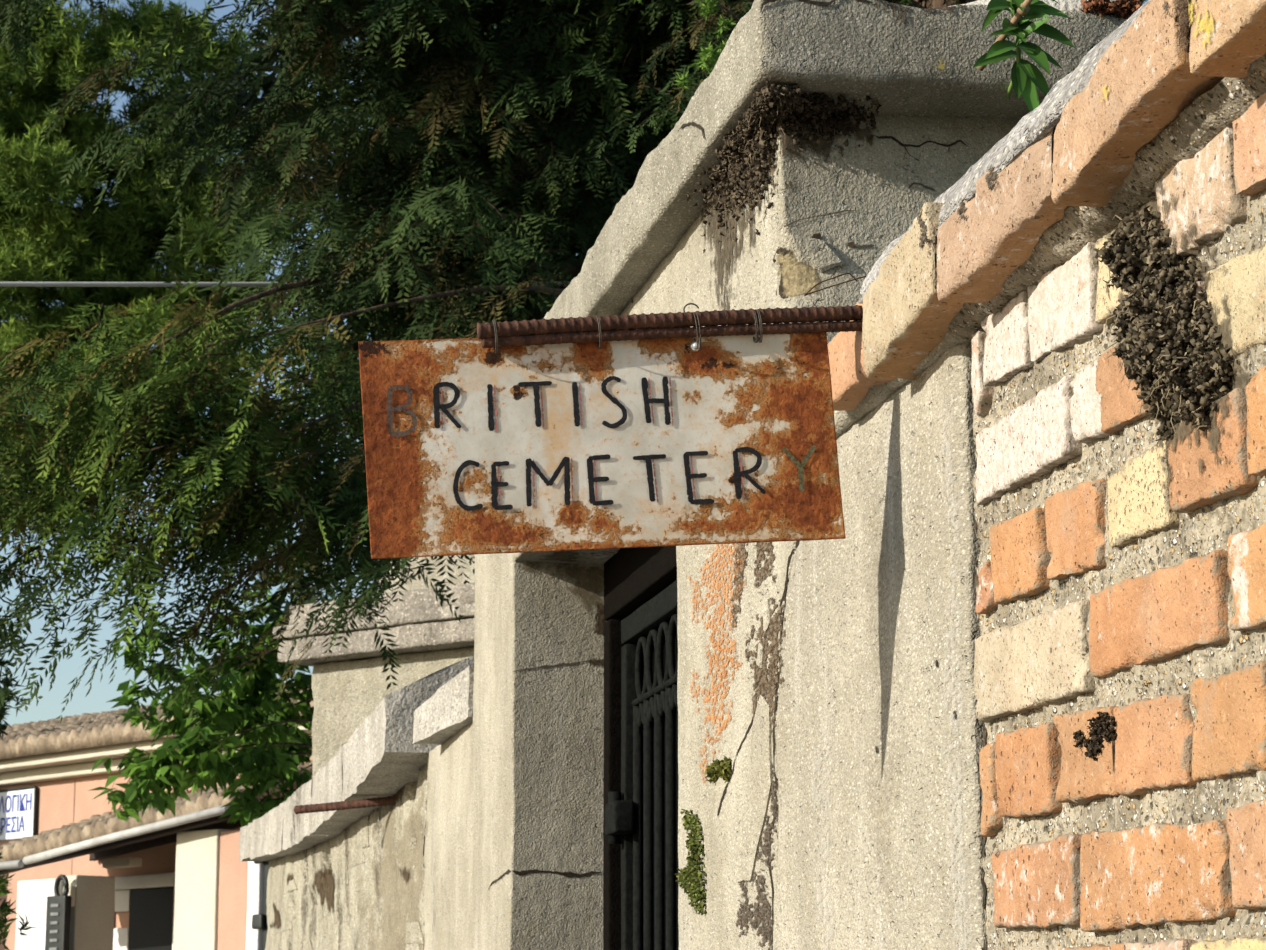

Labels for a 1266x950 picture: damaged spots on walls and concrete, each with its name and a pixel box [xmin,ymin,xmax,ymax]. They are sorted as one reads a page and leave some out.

leakage [780,113,878,192]
leakage [707,175,755,311]
spalling [773,233,855,299]
rust [685,544,745,783]
crack [717,541,799,950]
crack [488,869,602,890]